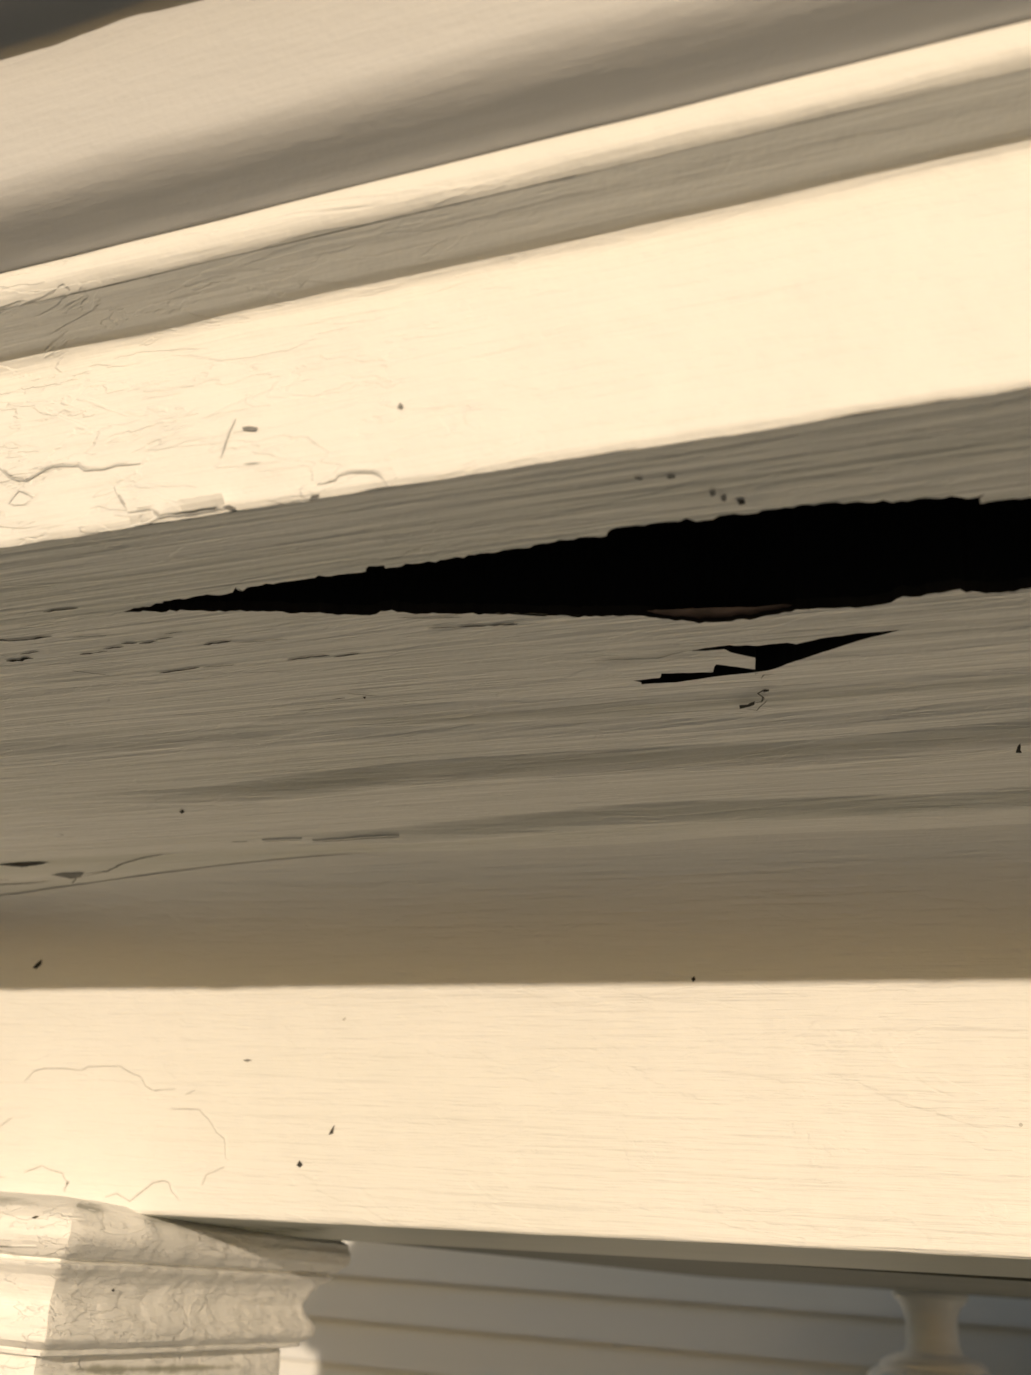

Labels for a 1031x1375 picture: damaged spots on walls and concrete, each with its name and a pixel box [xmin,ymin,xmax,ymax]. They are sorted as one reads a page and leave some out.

crack [217,418,261,464]
crack [0,454,143,481]
crack [23,1062,231,1202]
crack [0,1162,70,1192]